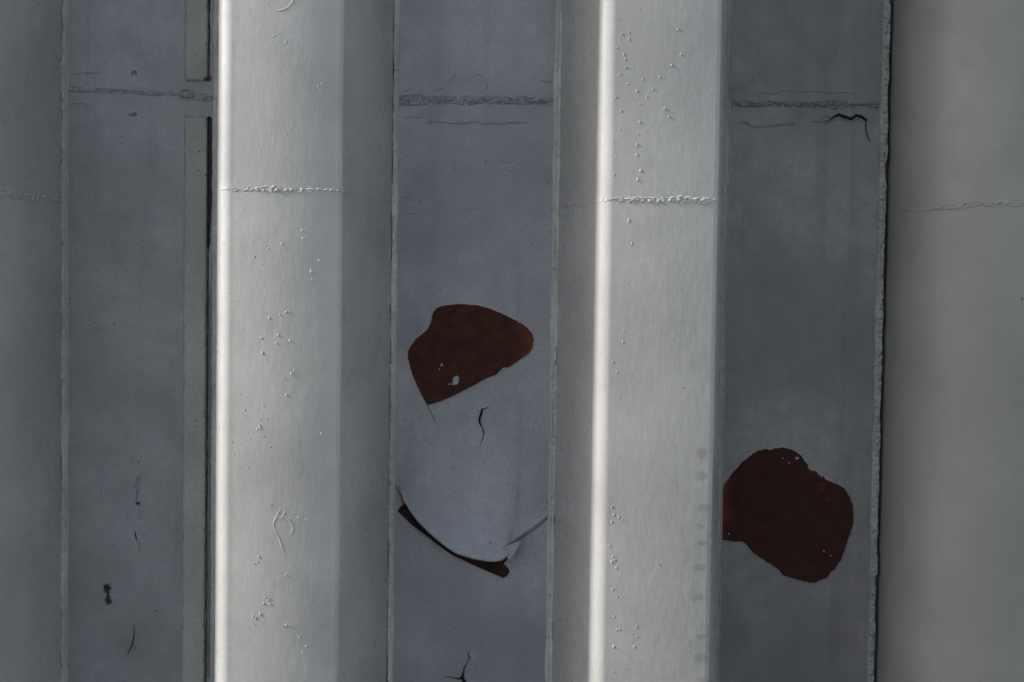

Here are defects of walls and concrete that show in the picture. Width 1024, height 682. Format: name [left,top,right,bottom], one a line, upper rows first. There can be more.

crack [739,79,871,143]
crack [478,407,488,440]
crack [446,652,479,682]